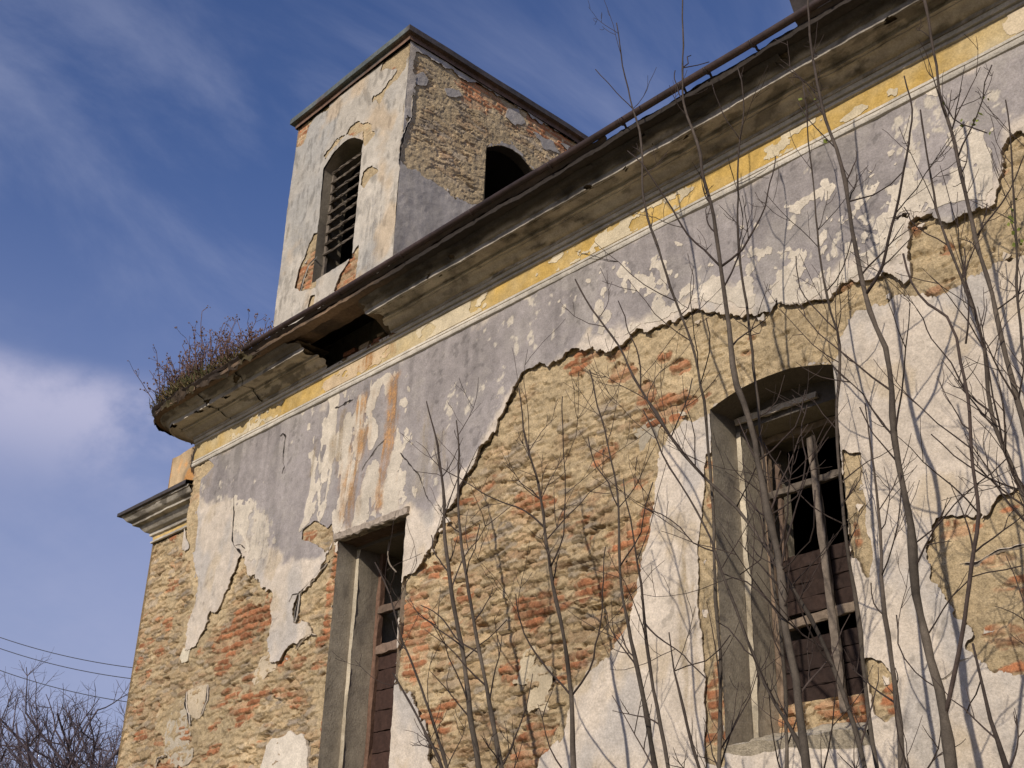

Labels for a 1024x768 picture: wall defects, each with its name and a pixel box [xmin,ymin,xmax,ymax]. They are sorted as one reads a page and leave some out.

spalling [297,106,329,147]
spalling [324,121,375,164]
spalling [372,43,576,205]
peeling [840,104,868,122]
spalling [361,166,378,188]
spalling [295,231,318,308]
spalling [334,245,359,292]
spalling [395,118,1024,768]
spalling [118,332,418,768]